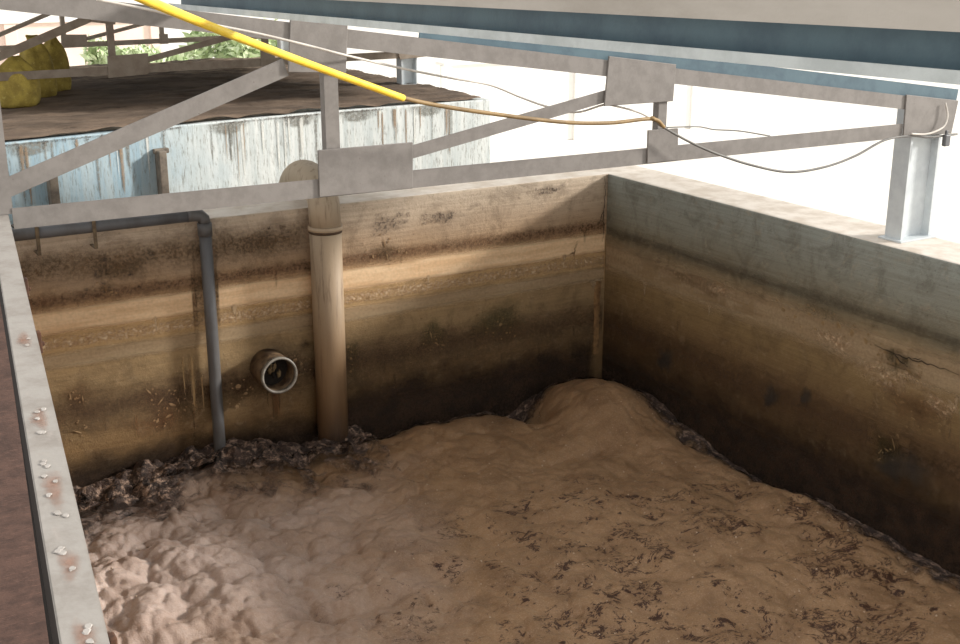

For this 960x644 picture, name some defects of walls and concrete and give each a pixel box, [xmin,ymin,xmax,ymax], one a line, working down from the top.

water stain [211,120,246,179]
water stain [261,114,318,168]
water stain [21,242,210,426]
water stain [214,262,313,341]
water stain [347,343,591,445]
water stain [343,221,960,415]
crack [874,344,958,375]
water stain [602,348,960,576]
corrosion [78,623,94,644]